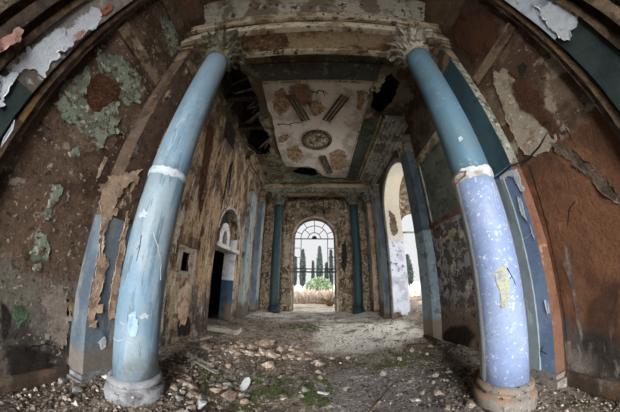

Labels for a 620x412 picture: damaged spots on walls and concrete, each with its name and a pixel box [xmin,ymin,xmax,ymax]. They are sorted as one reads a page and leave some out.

peeling [534,2,578,41]
peeling [0,3,114,107]
peeling [53,46,142,148]
peeling [371,73,386,93]
spalling [278,134,304,163]
spalling [493,62,619,204]
peeling [44,184,63,220]
peeling [29,232,50,273]
spalling [86,156,143,328]
peeling [388,210,398,236]
spalling [493,264,510,309]
damp [442,325,475,347]